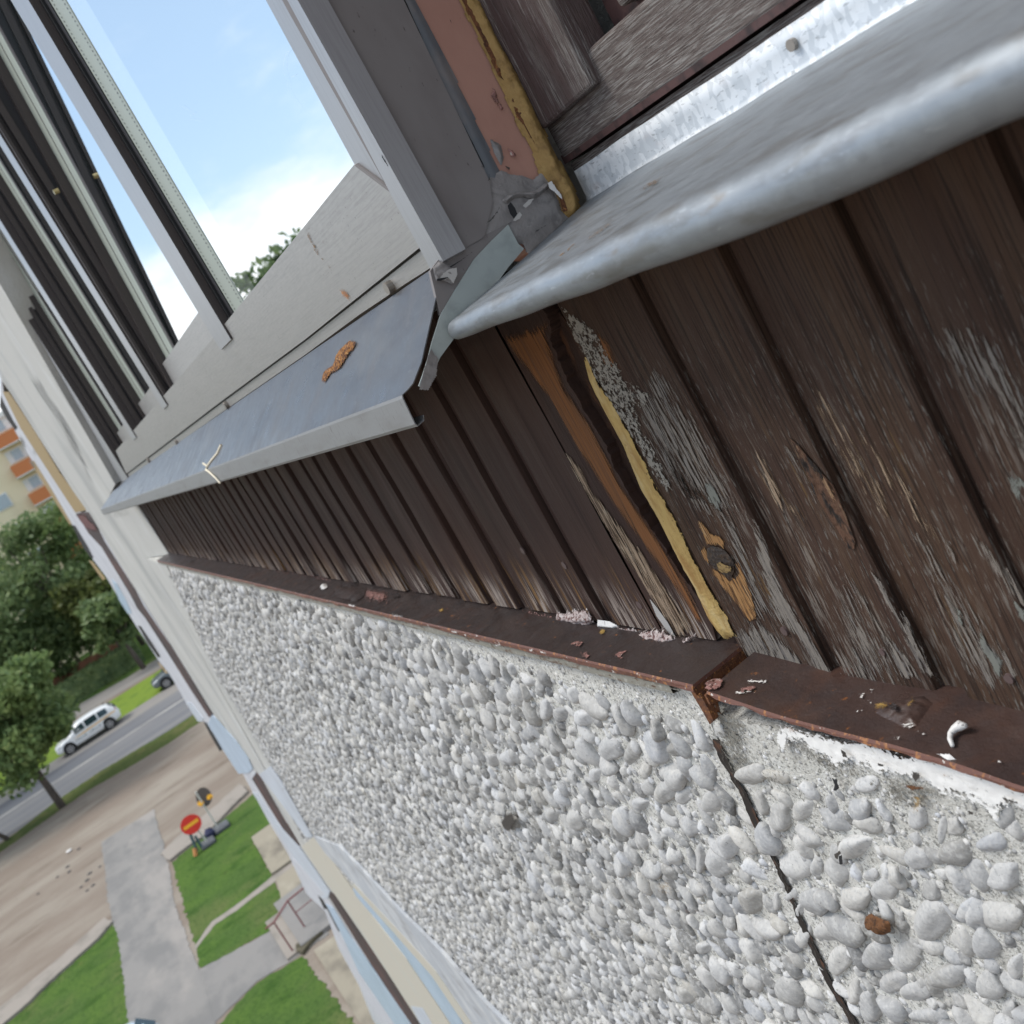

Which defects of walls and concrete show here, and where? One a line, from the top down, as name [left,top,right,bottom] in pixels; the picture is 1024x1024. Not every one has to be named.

peeling [462,0,504,80]
peeling [561,307,937,712]
crack [713,739,759,828]
crack [770,856,858,1024]
rust [864,913,891,935]